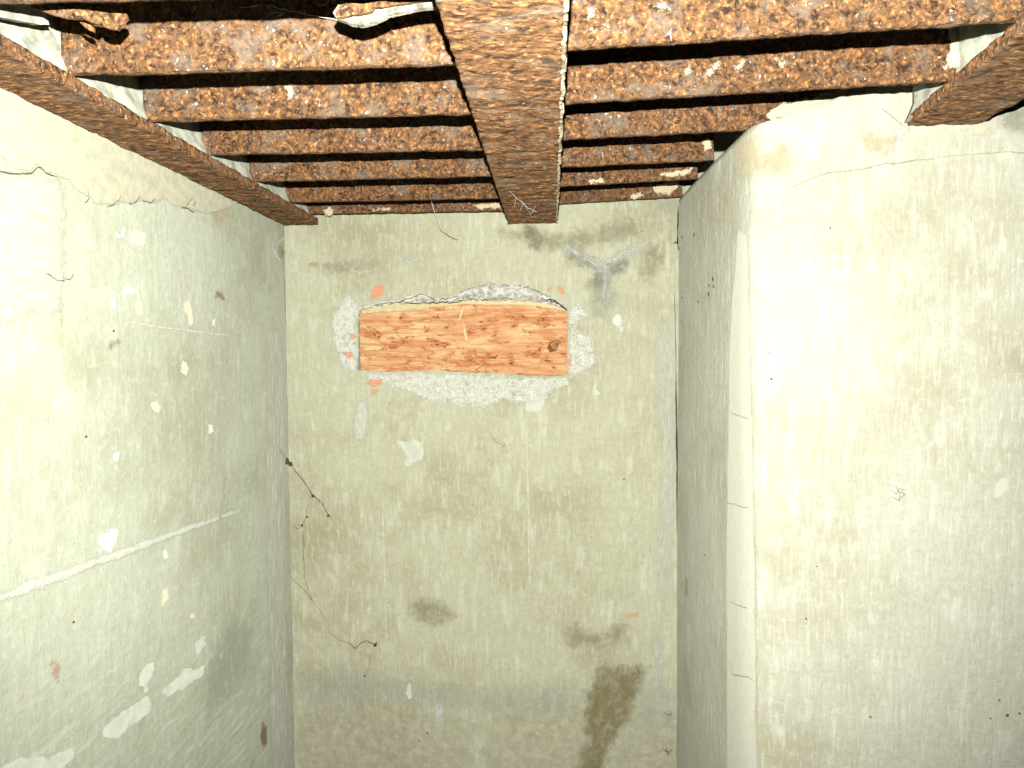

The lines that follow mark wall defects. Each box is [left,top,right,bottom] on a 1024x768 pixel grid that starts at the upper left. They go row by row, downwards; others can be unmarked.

rust [28,5,129,33]
rust [335,0,428,19]
crack [1,167,55,176]
crack [791,151,1024,187]
peeling [332,283,599,412]
peeling [162,636,206,697]
peeling [103,662,154,739]
leakage [489,668,640,768]